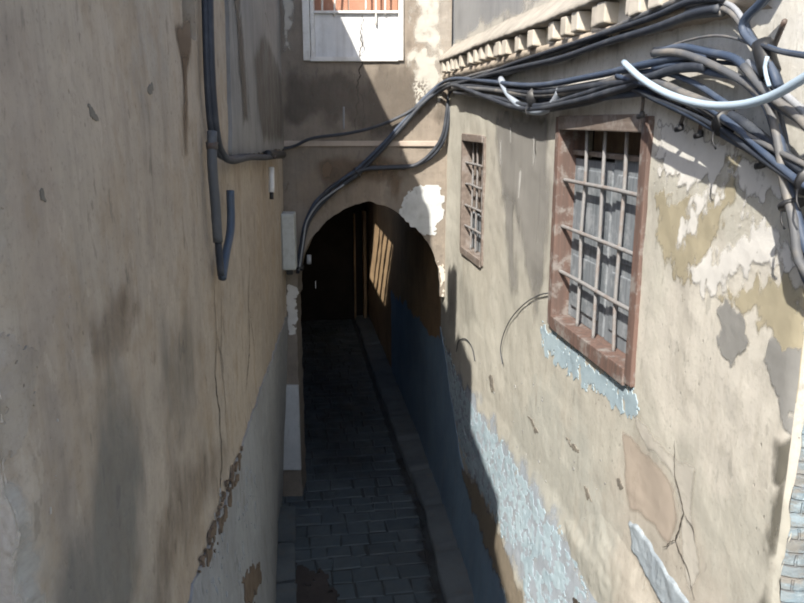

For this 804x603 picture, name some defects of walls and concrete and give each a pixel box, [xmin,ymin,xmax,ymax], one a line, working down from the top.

crack [356,15,364,88]
peeling [407,0,443,103]
peeling [399,185,445,235]
peeling [655,119,804,434]
spalling [0,332,40,462]
peeling [540,321,640,419]
peeling [444,338,587,603]
crack [664,448,695,596]